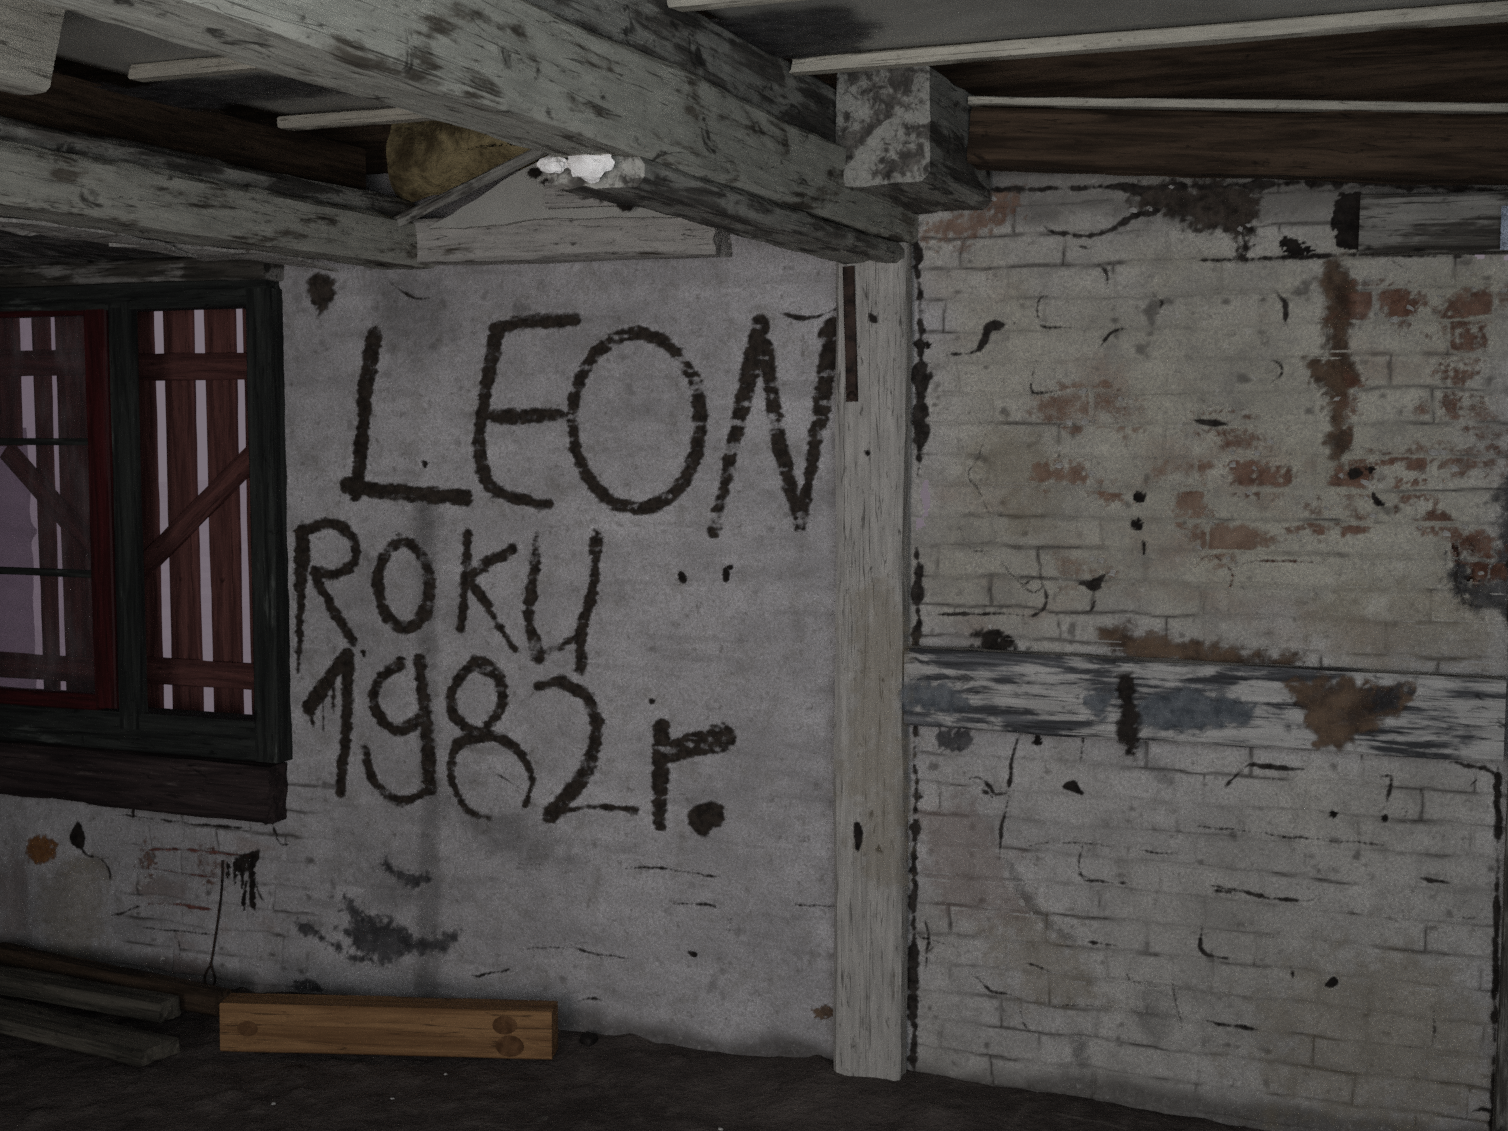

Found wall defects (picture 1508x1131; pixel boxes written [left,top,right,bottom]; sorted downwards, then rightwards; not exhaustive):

spalling [1127,178,1262,260]
spalling [1279,236,1316,259]
spalling [1331,192,1361,252]
rust [1303,259,1360,460]
peeling [1176,280,1508,581]
peeling [1031,459,1146,555]
leakage [338,894,364,922]
leakage [298,923,365,962]
leakage [403,933,458,956]